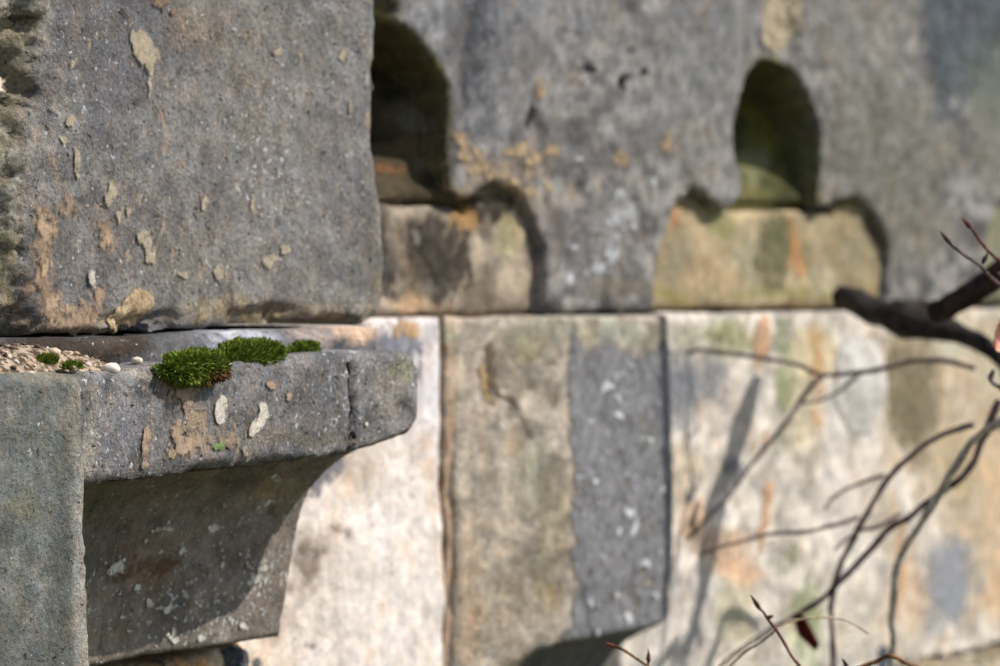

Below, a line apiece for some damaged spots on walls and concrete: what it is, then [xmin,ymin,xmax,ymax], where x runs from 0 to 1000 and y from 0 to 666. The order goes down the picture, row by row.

spalling [0,0,50,33]
spalling [762,0,805,52]
peeling [130,29,161,97]
peeling [0,77,156,335]
peeling [214,264,227,282]
peeling [263,244,291,269]
crack [345,361,359,451]